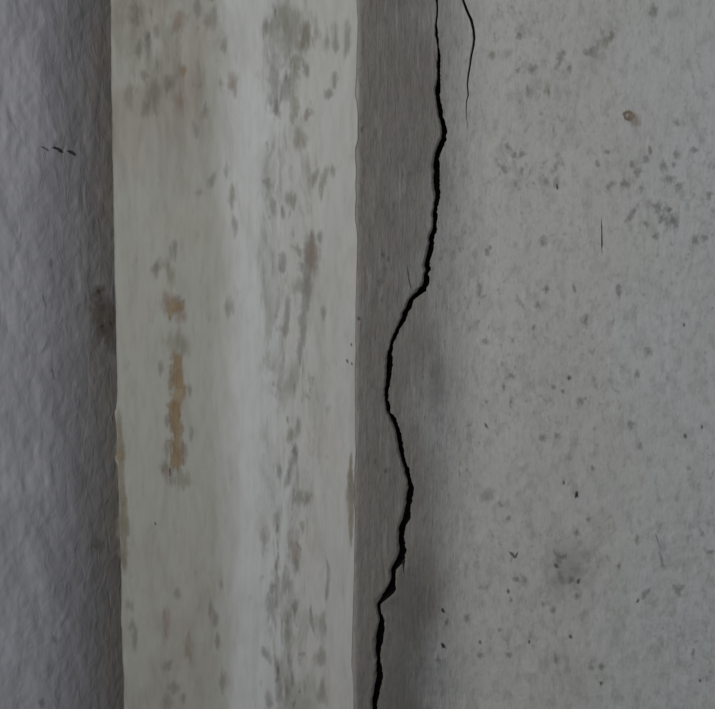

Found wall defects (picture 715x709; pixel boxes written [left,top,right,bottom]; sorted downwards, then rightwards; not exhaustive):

crack [462,0,475,118]
corrosion [169,355,185,469]
crack [369,0,447,709]